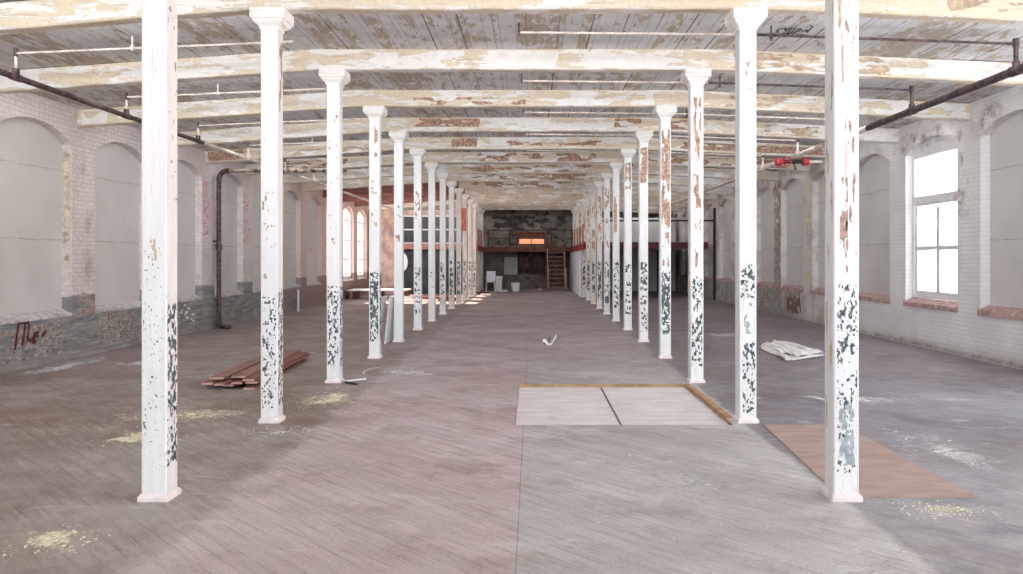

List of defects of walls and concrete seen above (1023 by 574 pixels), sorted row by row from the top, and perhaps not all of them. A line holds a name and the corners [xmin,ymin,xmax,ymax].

peeling [946,0,1023,12]
peeling [413,97,500,105]
peeling [415,118,602,187]
peeling [570,91,655,105]
peeling [614,118,642,127]
peeling [79,292,195,467]
peeling [262,287,283,408]
peeling [328,286,343,366]
peeling [370,272,381,342]
peeling [741,179,811,413]
peeling [825,283,858,473]